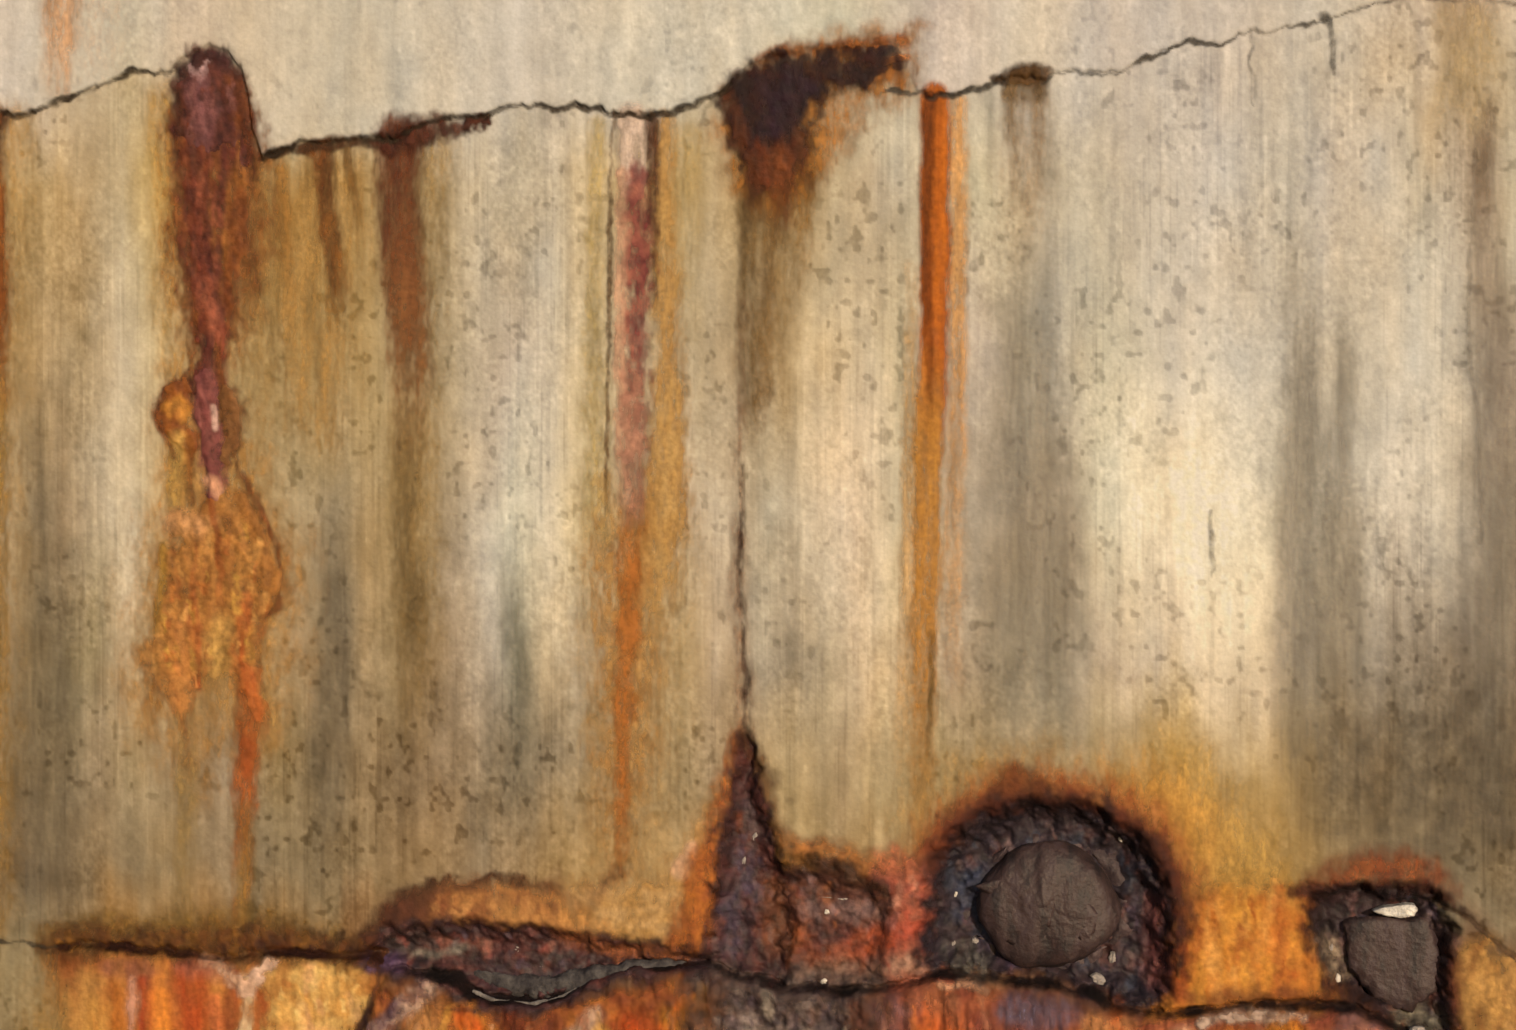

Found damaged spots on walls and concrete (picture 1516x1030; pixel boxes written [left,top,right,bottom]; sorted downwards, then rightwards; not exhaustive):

crack [2,66,155,119]
crack [262,84,731,161]
crack [886,80,1004,100]
crack [1087,38,1235,75]
rust [0,110,21,532]
crack [605,171,613,478]
rust [715,27,966,742]
rust [36,46,717,1030]
crack [422,967,569,1006]
spalling [359,732,1201,1030]
crack [915,969,1407,1030]
spalling [1288,852,1466,1030]